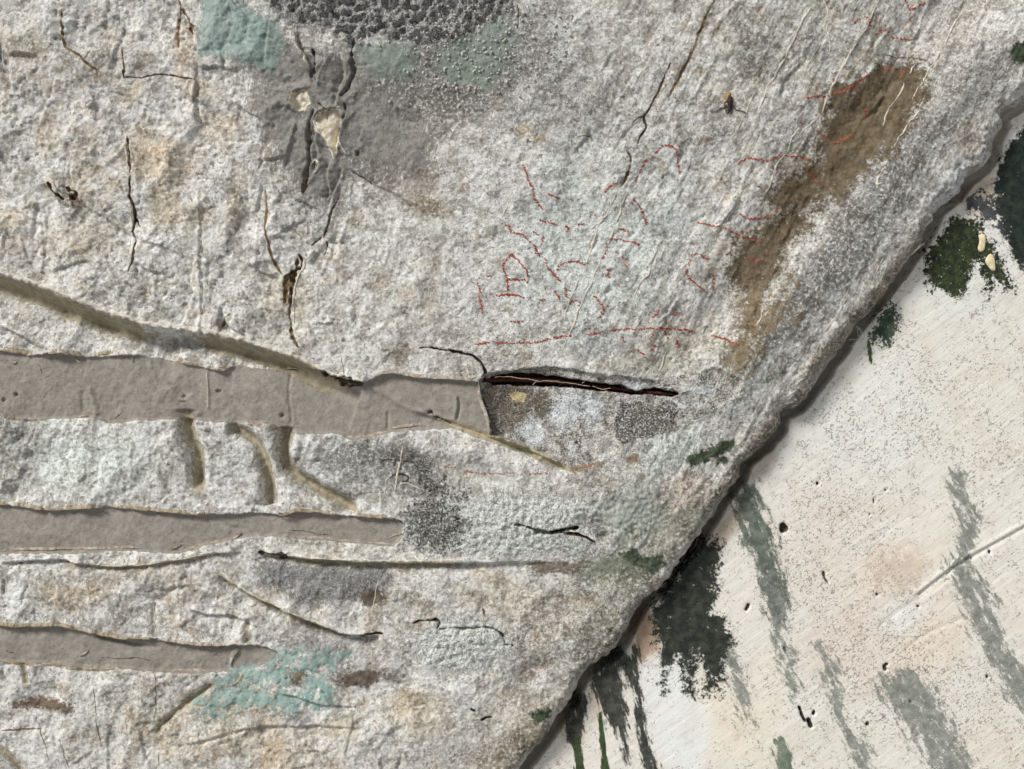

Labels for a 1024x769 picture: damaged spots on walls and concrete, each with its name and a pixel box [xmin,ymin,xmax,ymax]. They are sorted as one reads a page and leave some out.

peeling [235,0,515,214]
crack [621,0,715,187]
crack [124,137,141,271]
crack [264,189,340,348]
water stain [709,55,939,387]
water stain [949,129,1024,271]
peeling [0,346,744,473]
peeling [0,501,405,560]
crack [549,526,595,543]
peeling [0,622,278,686]
water stain [560,476,805,769]